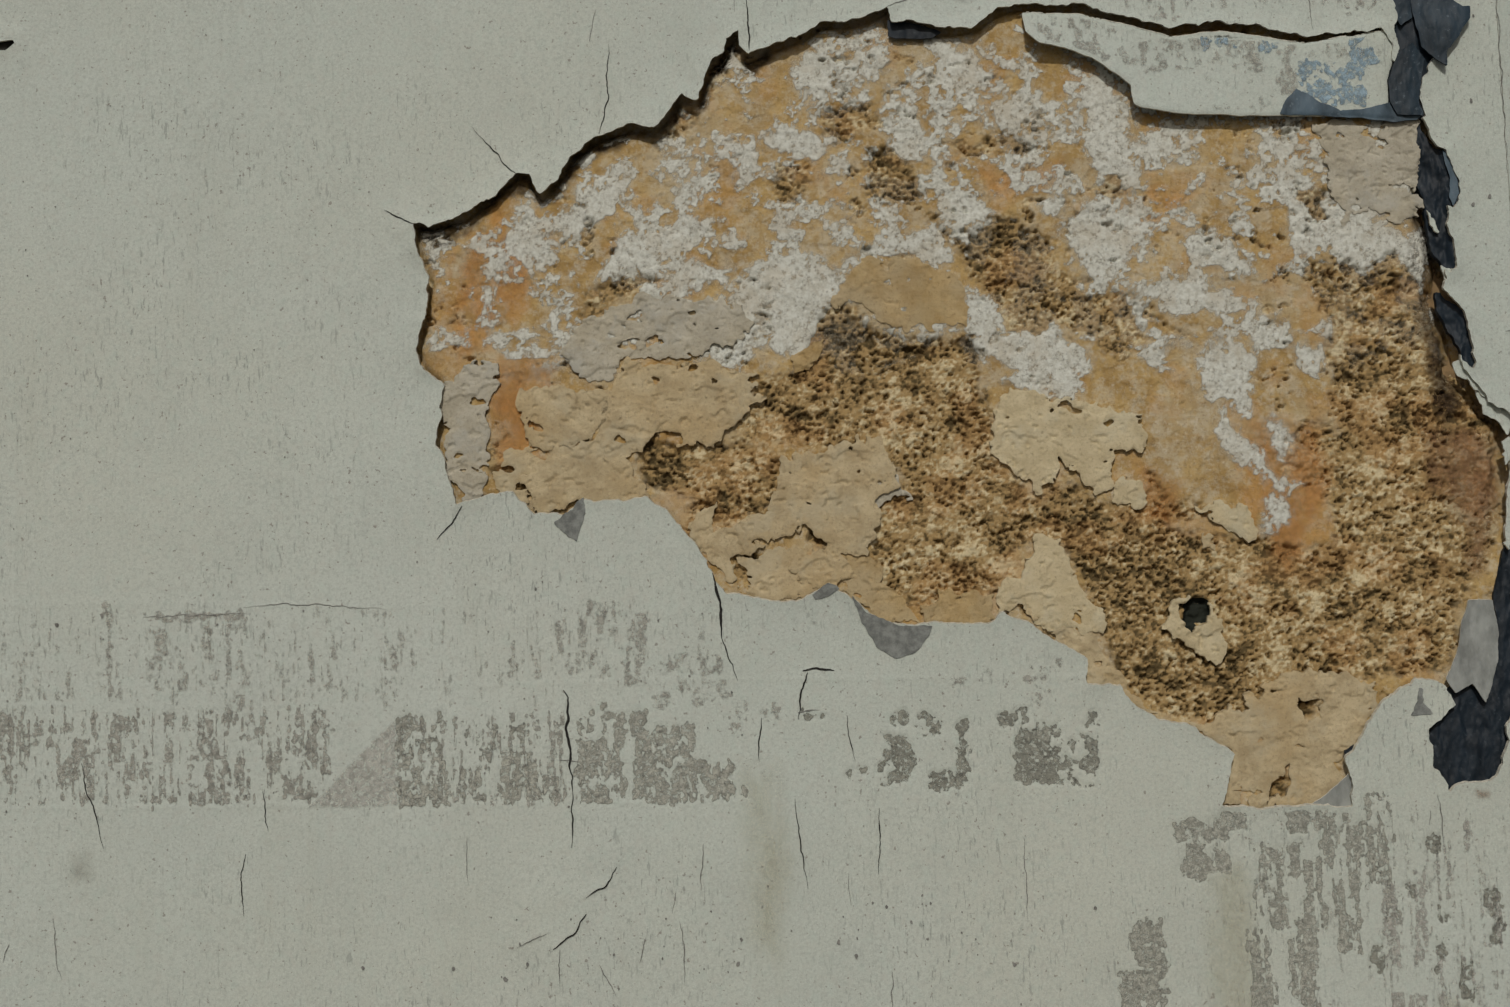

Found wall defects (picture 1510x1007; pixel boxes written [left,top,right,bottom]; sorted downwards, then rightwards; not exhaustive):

spalling [414,0,1510,1007]